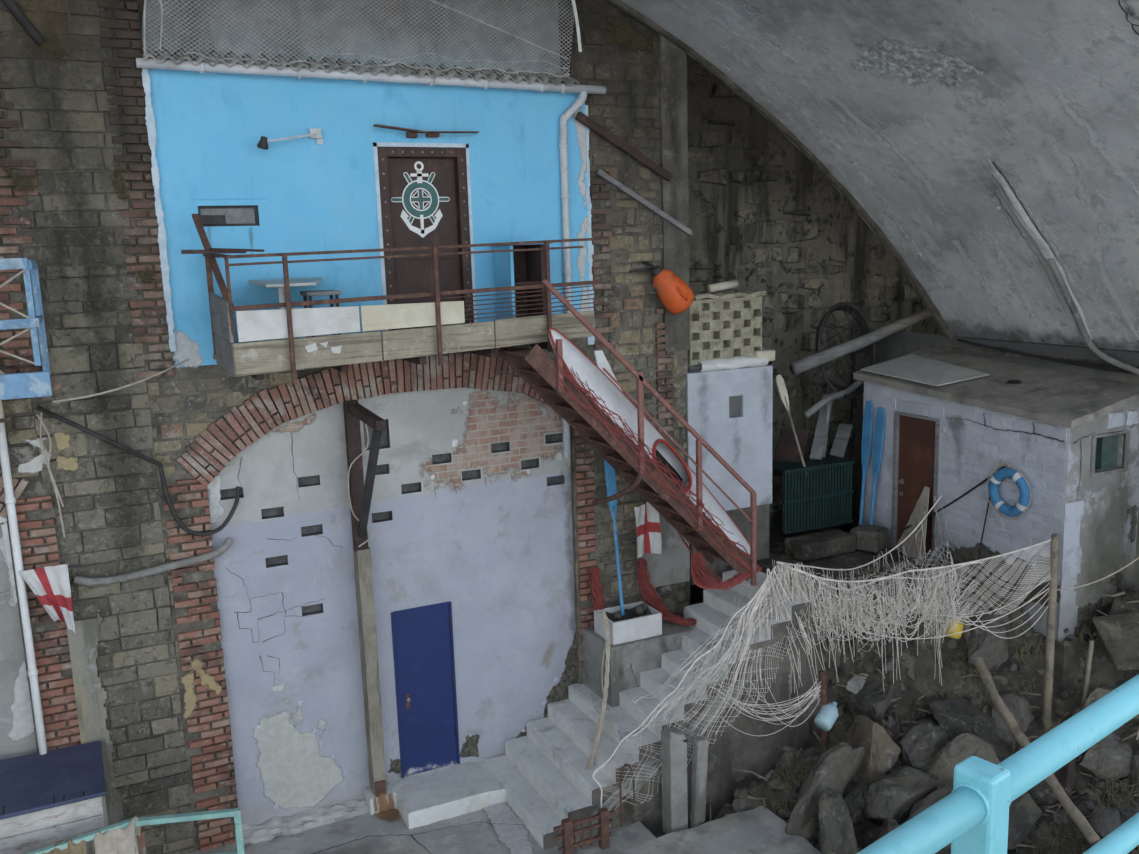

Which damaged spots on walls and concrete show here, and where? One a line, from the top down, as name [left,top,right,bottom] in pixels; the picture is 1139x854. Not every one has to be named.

crack [1118,0,1139,35]
peeling [851,39,984,101]
flaking render [142,68,202,368]
flaking render [421,389,563,489]
crack [226,568,322,685]
peeling [8,661,34,741]
peeling [253,684,347,810]